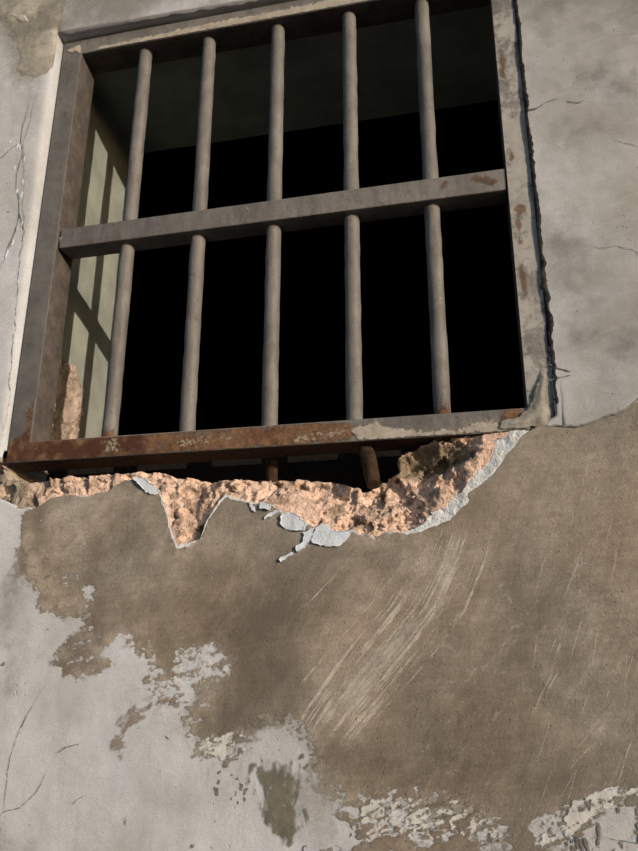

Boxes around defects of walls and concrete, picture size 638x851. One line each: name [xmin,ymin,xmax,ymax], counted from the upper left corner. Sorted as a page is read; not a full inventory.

crack [0,101,30,271]
peeling [5,179,25,296]
corrosion [514,204,526,243]
flaking render [51,358,85,440]
corrosion [6,403,483,472]
peeling [0,402,638,851]
crack [2,687,50,813]